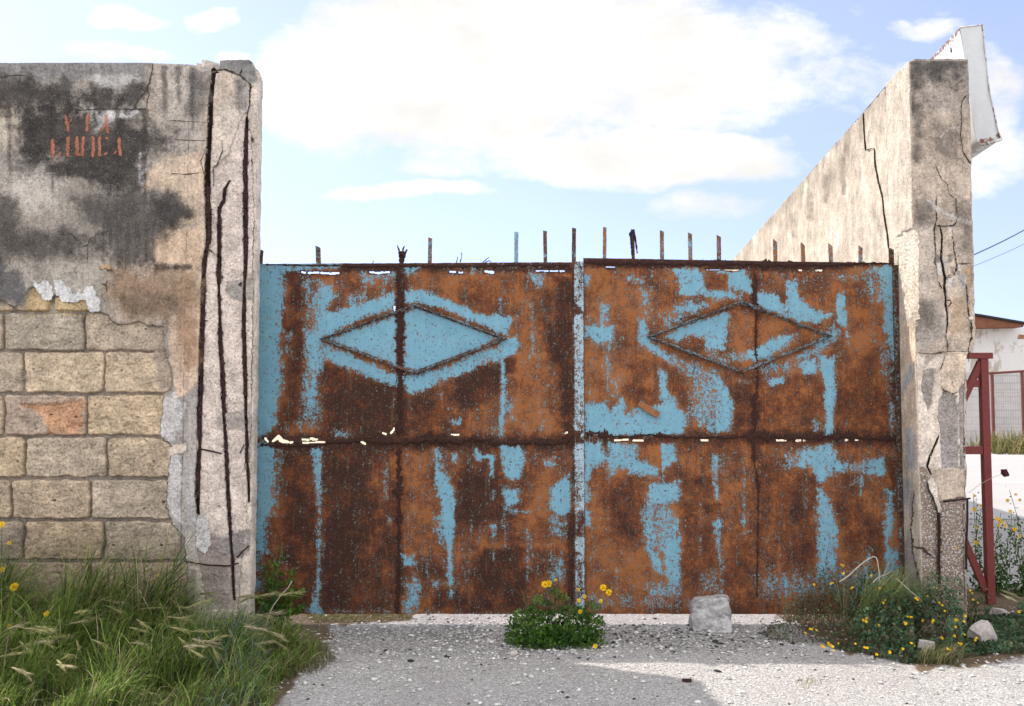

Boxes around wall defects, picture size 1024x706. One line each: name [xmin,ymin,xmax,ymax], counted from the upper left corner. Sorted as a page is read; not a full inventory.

damp [0,73,192,305]
flaking render [0,114,254,616]
crack [171,67,252,600]
crack [863,113,889,248]
crack [919,165,973,394]
crack [960,95,971,163]
spalling [919,468,971,613]